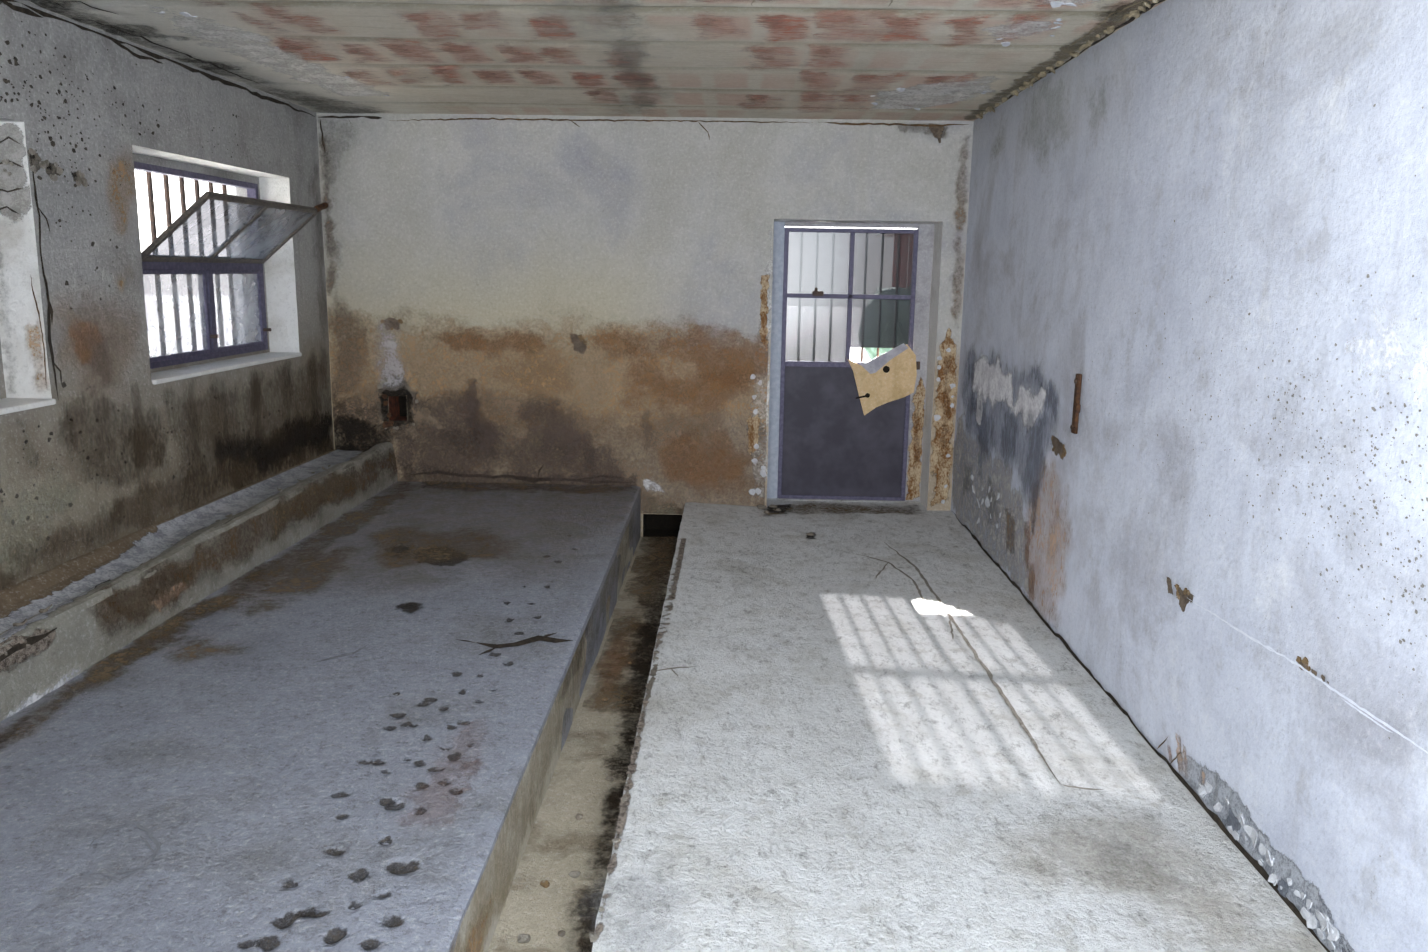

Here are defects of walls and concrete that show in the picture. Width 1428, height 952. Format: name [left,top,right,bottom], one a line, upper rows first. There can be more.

leakage [30,0,379,114]
spalling [871,0,1165,120]
peeling [0,123,88,221]
spalling [376,318,419,431]
leakage [91,266,768,634]
leakage [970,356,1056,532]
flaking render [0,450,362,673]
flaking render [1177,752,1355,952]